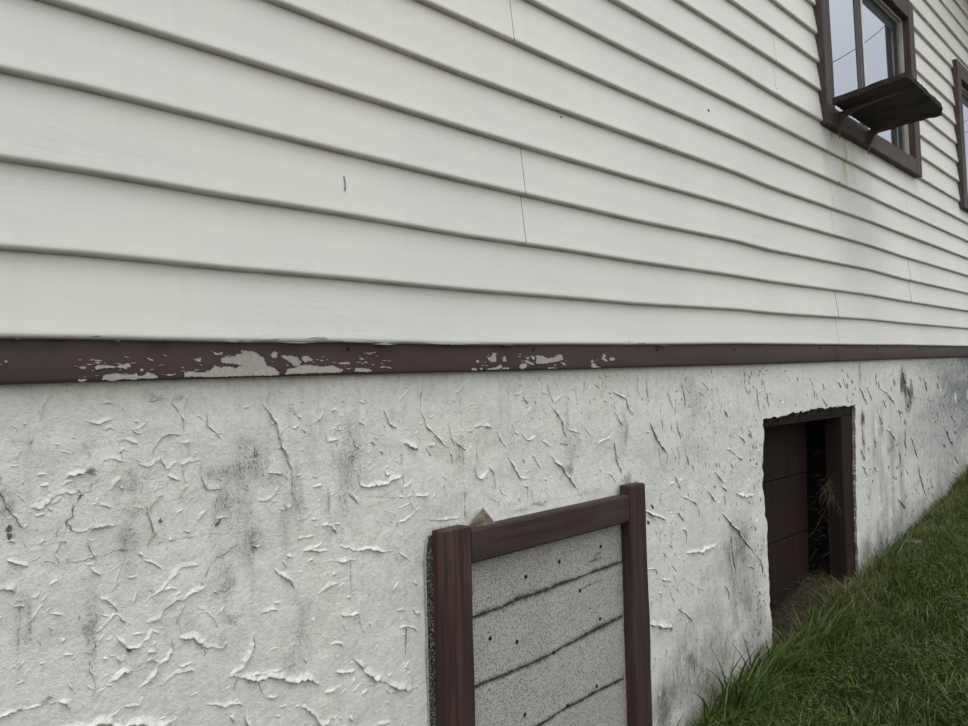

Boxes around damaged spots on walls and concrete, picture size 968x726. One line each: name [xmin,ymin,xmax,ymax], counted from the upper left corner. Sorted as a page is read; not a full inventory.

peeling [76,337,396,382]
peeling [472,345,567,371]